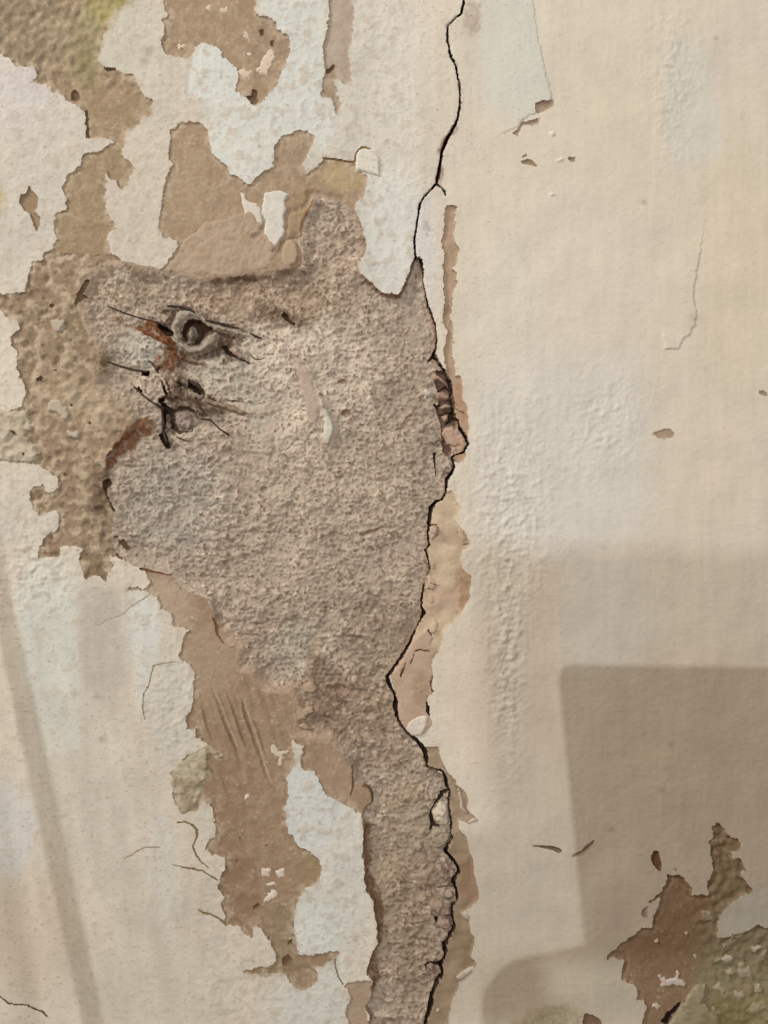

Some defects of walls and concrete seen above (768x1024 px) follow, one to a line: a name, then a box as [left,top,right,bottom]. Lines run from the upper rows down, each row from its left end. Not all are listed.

peeling [512,99,554,137]
rust [106,417,153,467]
rust [137,321,183,373]
spalling [0,0,479,1024]
crack [385,0,469,1024]
peeling [607,823,768,1024]